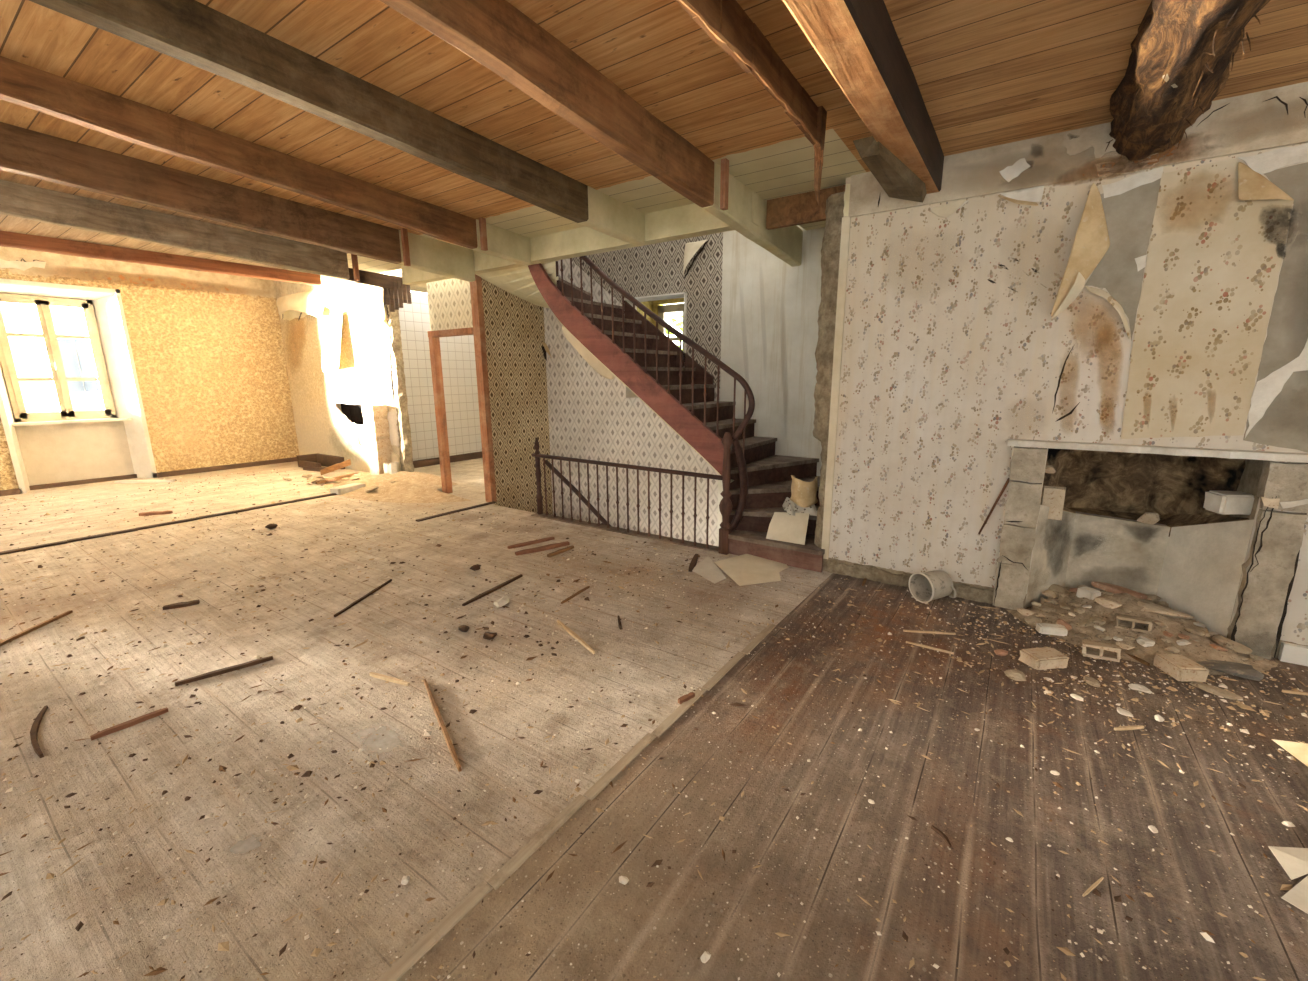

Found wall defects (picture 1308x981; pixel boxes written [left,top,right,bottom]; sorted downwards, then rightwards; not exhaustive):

crack [1263,96,1308,118]
flaking render [999,158,1031,182]
flaking render [1062,129,1116,158]
flaking render [1085,178,1161,341]
water stain [1264,208,1294,257]
flaking render [1243,162,1308,453]
spalling [1041,448,1246,516]
spalling [1261,497,1308,509]
crack [1231,496,1277,641]
crack [1274,513,1307,658]